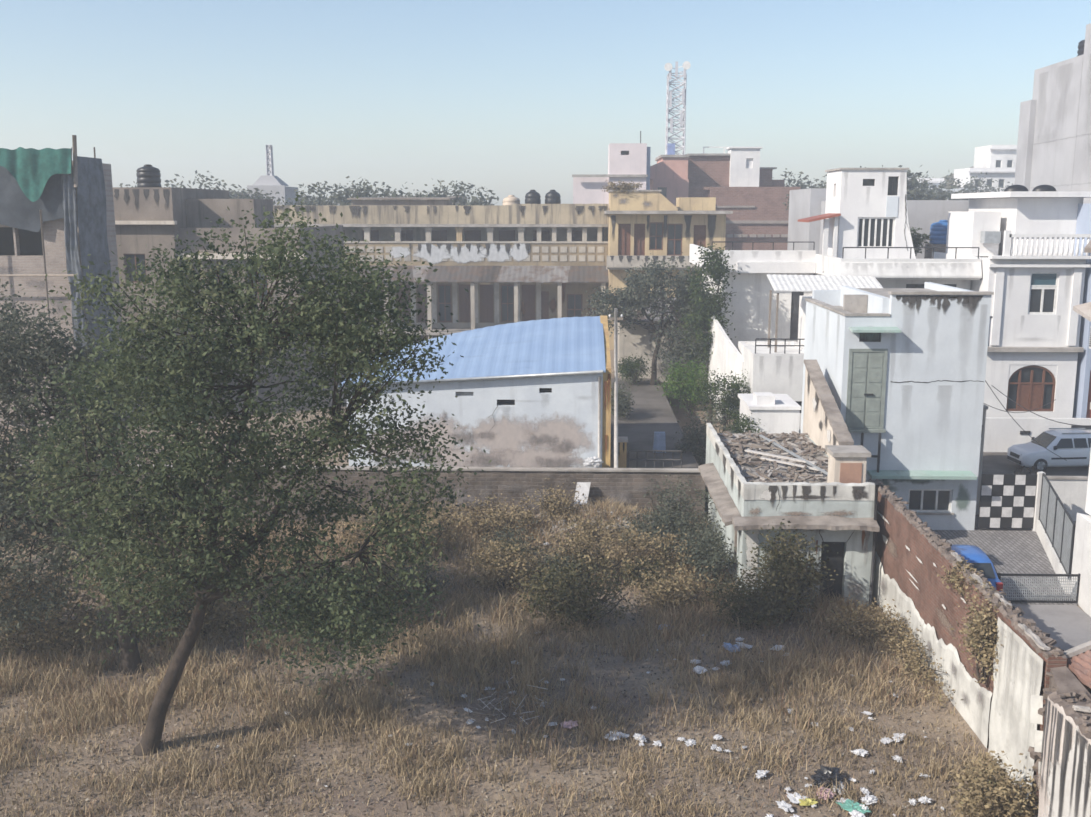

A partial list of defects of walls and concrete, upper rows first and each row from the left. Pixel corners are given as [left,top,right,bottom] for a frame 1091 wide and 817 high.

peeling [390,243,528,264]
water stain [896,295,983,313]
water stain [535,437,571,467]
water stain [768,485,836,505]
water stain [852,486,867,499]
water stain [1040,699,1091,817]